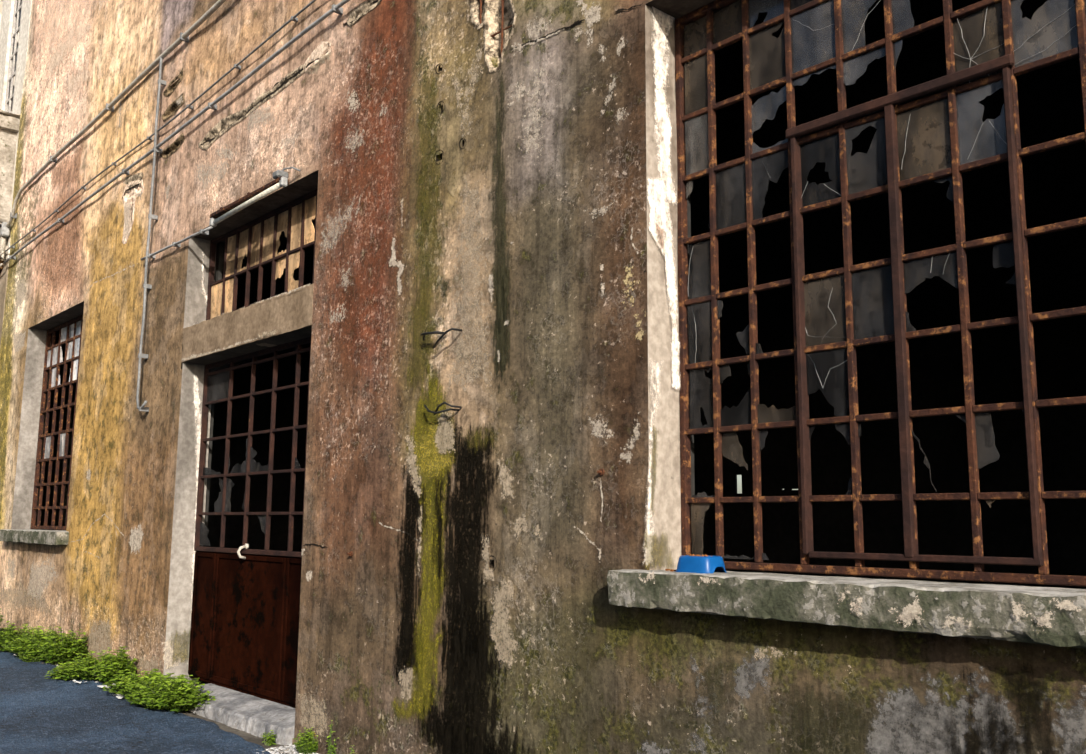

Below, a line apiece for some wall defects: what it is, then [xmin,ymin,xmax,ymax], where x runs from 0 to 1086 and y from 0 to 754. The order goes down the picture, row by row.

spalling [470,0,517,72]
crack [511,19,586,50]
flaking render [162,68,185,121]
flaking render [160,133,184,159]
flaking render [122,172,144,244]
peeling [620,6,680,584]
water stain [392,420,534,754]
spalling [838,590,863,616]
spalling [891,596,922,627]
spalling [1011,598,1081,631]
water stain [784,688,866,754]
water stain [946,664,1055,754]